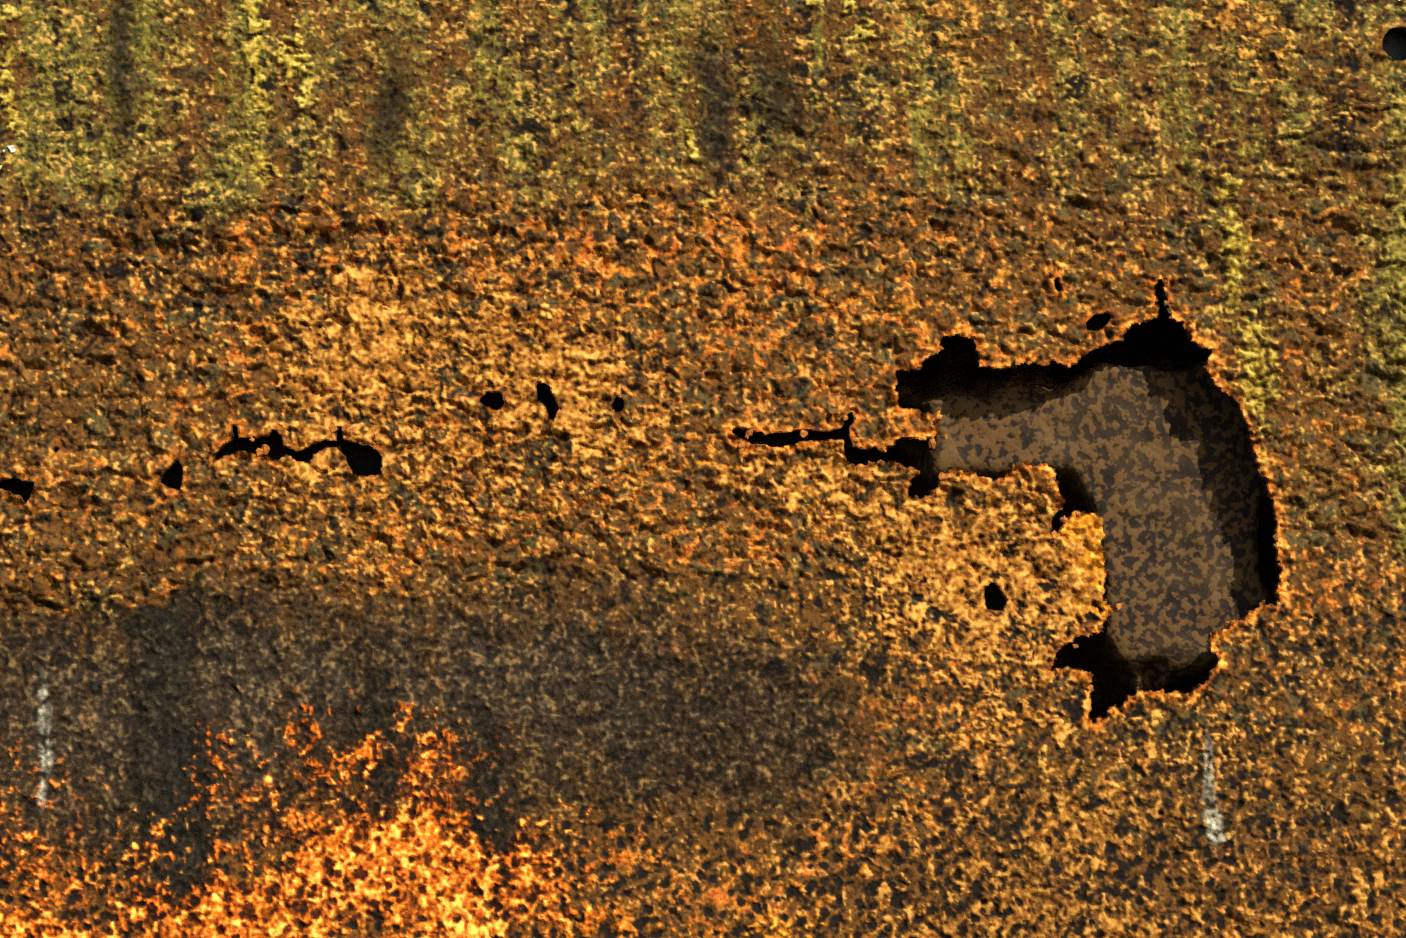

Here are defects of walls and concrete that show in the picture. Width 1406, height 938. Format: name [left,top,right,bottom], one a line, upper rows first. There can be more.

water stain [0,5,25,134]
water stain [238,0,318,186]
spalling [0,478,34,503]
spalling [161,461,183,490]
rust [227,202,688,592]
spalling [537,384,559,420]
crack [722,403,870,469]
spalling [984,583,1006,611]
rust [709,433,1283,938]
water stain [0,574,821,929]
rust [0,703,641,938]
rust [1173,810,1406,938]